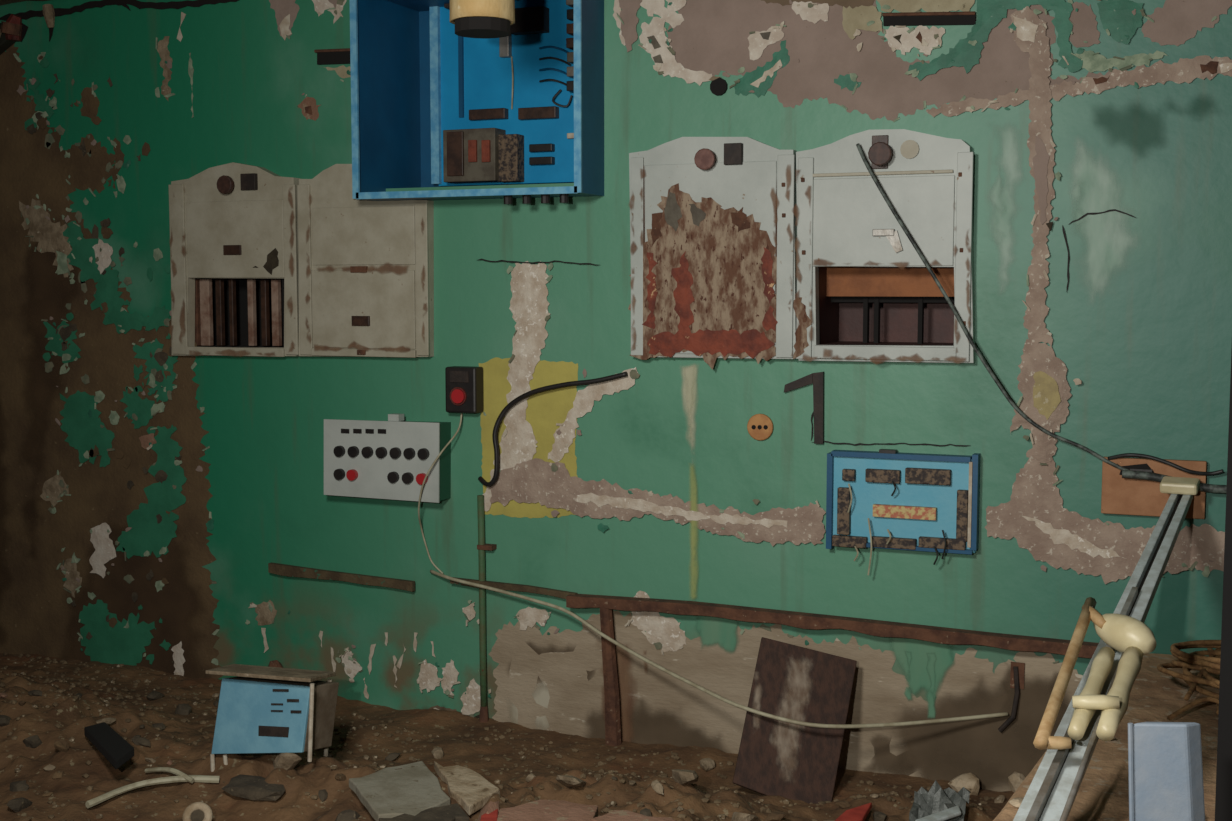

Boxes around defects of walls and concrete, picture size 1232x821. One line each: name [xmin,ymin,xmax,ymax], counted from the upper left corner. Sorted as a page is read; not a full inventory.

peeling [155,12,194,118]
peeling [0,43,223,679]
spalling [479,261,826,546]
peeling [613,0,1232,584]
crack [1062,209,1136,289]
spalling [319,591,1083,774]
spalling [989,783,1023,808]